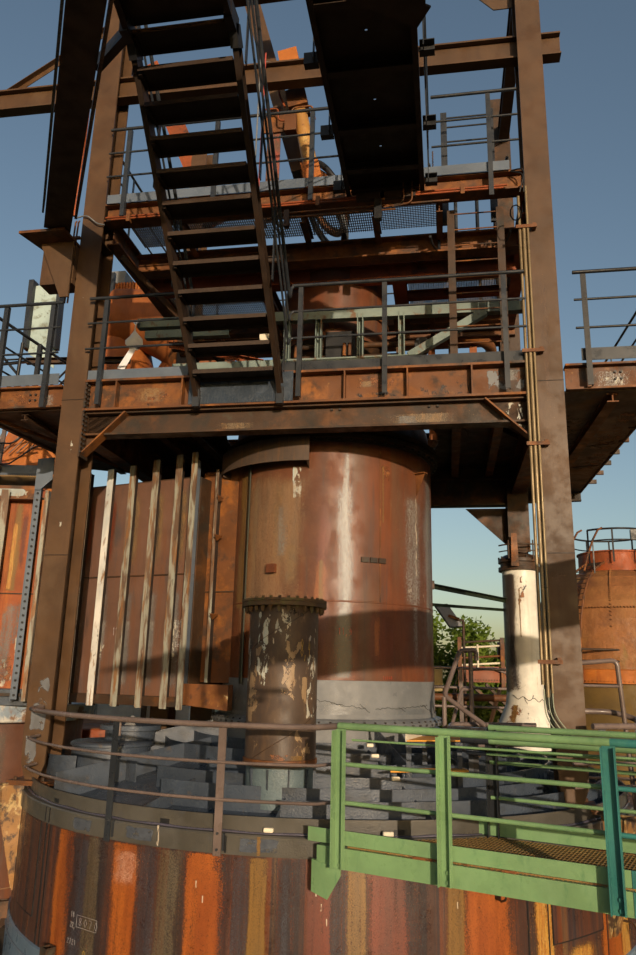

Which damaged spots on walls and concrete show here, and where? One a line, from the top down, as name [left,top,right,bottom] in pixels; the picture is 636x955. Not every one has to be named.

peeling [487,370,524,389]
peeling [293,467,301,497]
rust [5,504,31,591]
rust [86,502,98,569]
rust [109,496,119,566]
peeling [247,609,316,721]
crack [317,699,431,715]
rust [47,829,78,955]
rust [99,842,144,955]
rust [174,851,232,955]
rust [295,860,342,955]